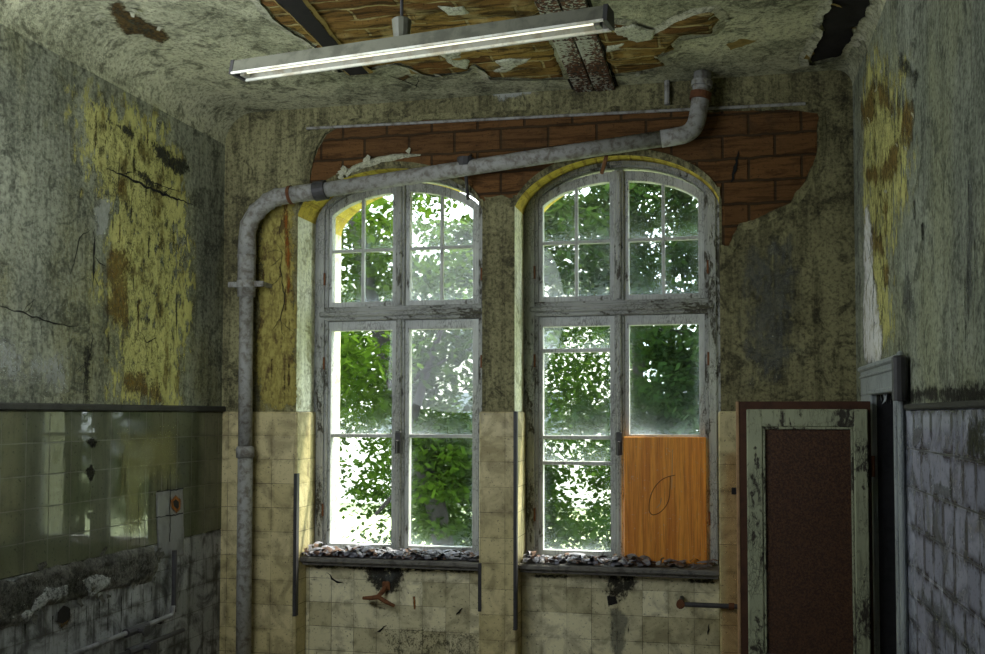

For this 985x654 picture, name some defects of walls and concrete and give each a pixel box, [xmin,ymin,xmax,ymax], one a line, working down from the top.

peeling [94,3,179,49]
spalling [250,0,540,49]
spalling [598,5,732,77]
spalling [303,40,691,184]
crack [107,168,193,205]
spalling [450,102,827,256]
peeling [859,70,914,292]
spalling [0,547,165,630]